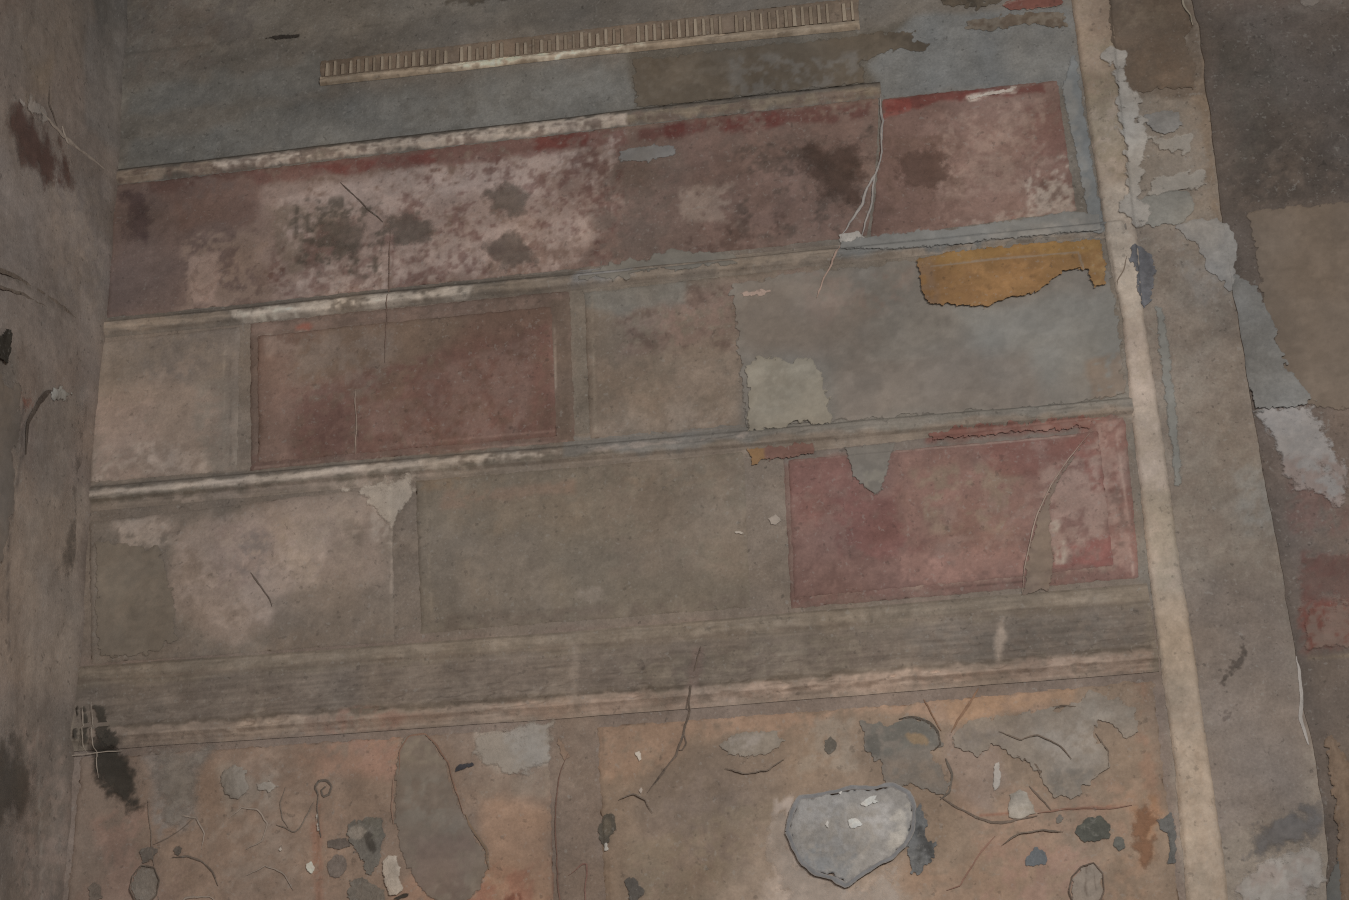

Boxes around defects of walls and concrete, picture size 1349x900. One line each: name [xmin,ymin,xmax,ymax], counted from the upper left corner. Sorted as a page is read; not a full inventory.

flaking render [942,0,1068,31]
flaking render [1109,0,1197,93]
flaking render [1129,244,1157,307]
damp [73,705,118,748]
crack [647,646,701,793]
flaking render [785,690,1139,888]
spalling [306,779,409,900]